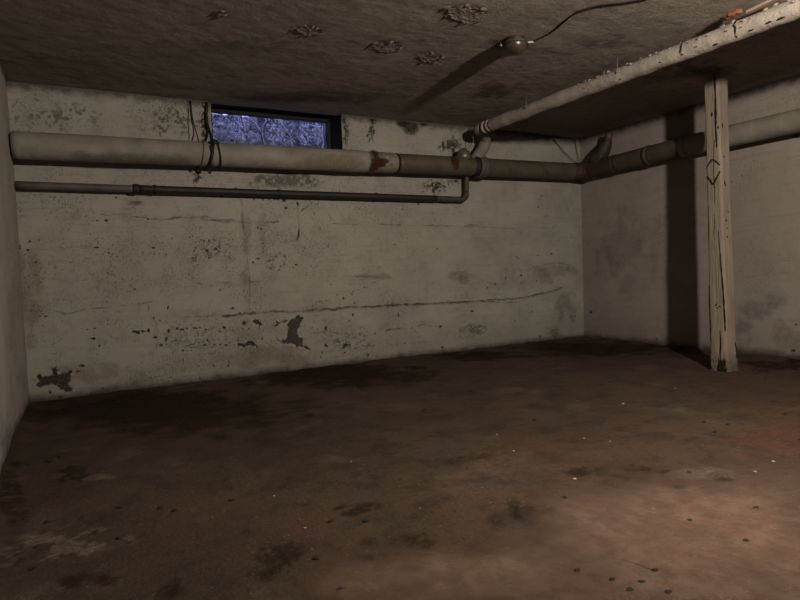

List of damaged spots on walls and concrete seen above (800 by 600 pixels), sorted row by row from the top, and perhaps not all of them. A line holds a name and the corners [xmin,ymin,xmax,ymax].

corrosion [370,150,389,171]
flaking render [274,315,311,350]
flaking render [33,364,85,398]